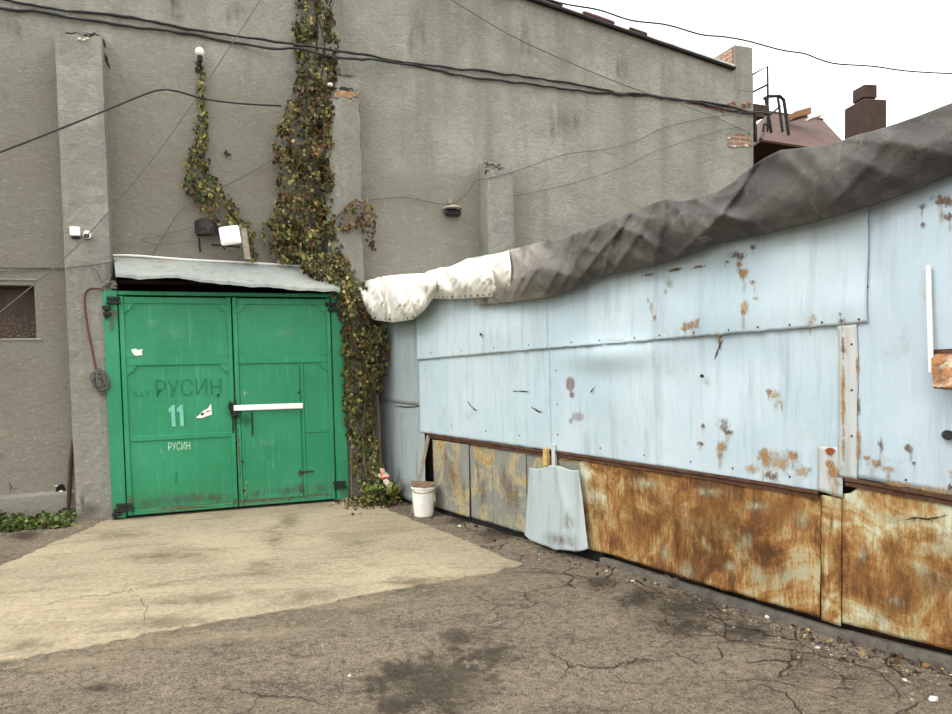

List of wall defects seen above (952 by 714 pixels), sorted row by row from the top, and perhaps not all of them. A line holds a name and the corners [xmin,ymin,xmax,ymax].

rust [726,245,755,283]
rust [825,336,952,494]
rust [717,420,733,458]
rust [746,449,810,480]